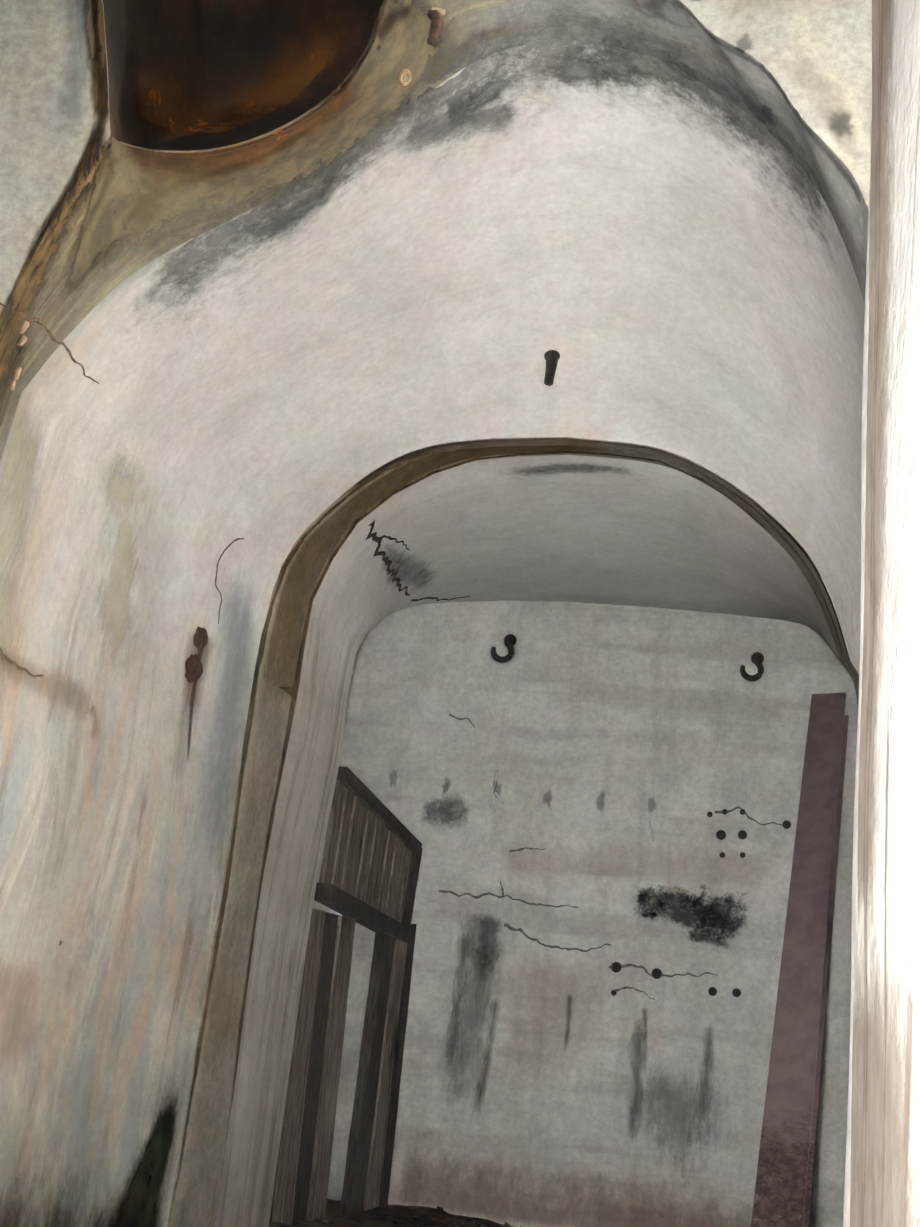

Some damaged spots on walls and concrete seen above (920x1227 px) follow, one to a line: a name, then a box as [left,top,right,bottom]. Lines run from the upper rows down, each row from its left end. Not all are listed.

damp [0,0,823,410]
crack [0,302,99,384]
crack [366,519,470,602]
damp [634,0,892,1227]
crack [0,648,44,678]
corrosion [188,681,198,753]
damp [176,446,840,1185]
crack [509,846,545,854]
crack [715,806,783,826]
crack [439,881,718,1000]